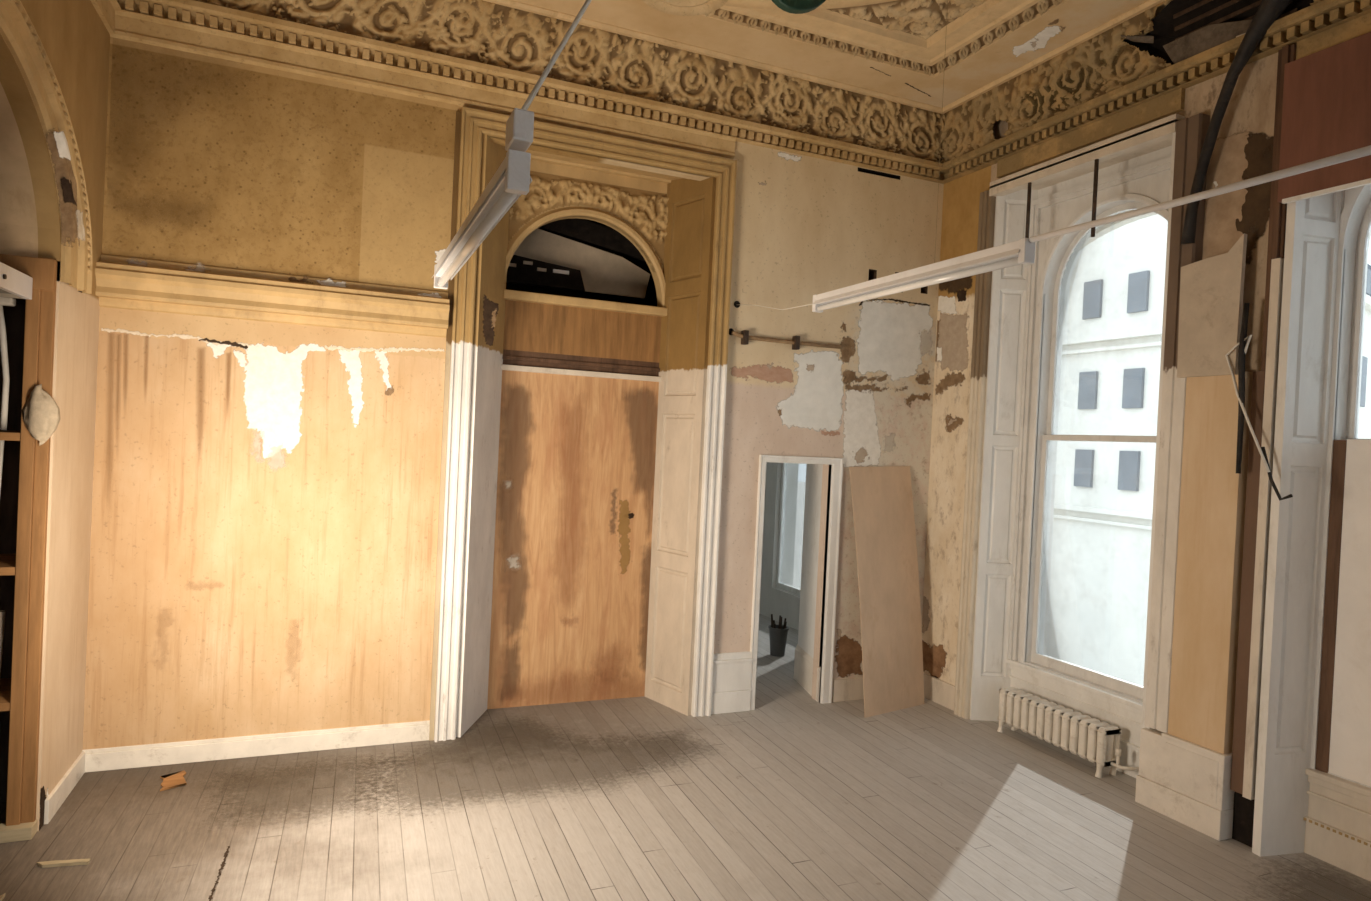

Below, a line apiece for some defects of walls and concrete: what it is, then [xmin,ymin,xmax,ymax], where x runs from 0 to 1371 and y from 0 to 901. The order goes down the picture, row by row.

peeling [207,342,394,469]
damp [629,392,656,494]
flaking render [731,290,969,467]
damp [502,390,528,629]
damp [611,490,651,660]
spalling [835,629,863,678]
spalling [922,596,947,679]